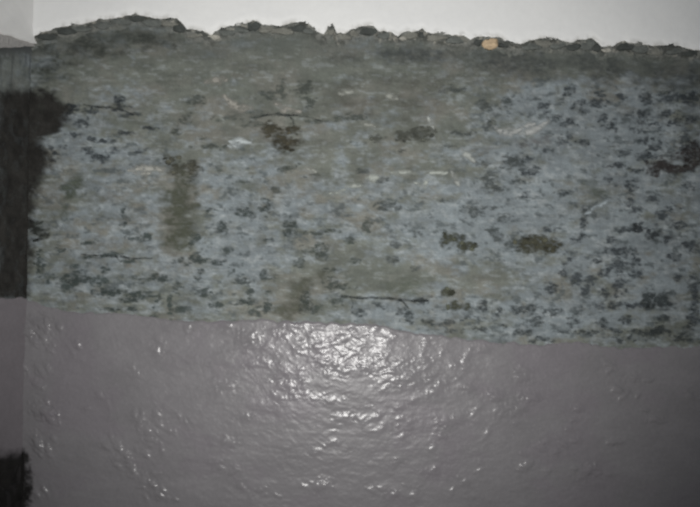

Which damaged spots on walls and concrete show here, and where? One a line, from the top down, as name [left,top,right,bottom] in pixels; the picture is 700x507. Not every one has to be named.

flaking render [31,13,700,64]
spalling [250,112,300,151]
damp [0,89,68,298]
damp [164,168,200,248]
spalling [442,232,477,251]
spalling [486,228,562,253]
spalling [620,222,671,243]
spalling [609,134,700,212]
peeling [61,264,158,317]
crack [350,296,428,307]
spalling [441,287,470,310]
peeling [560,237,672,343]